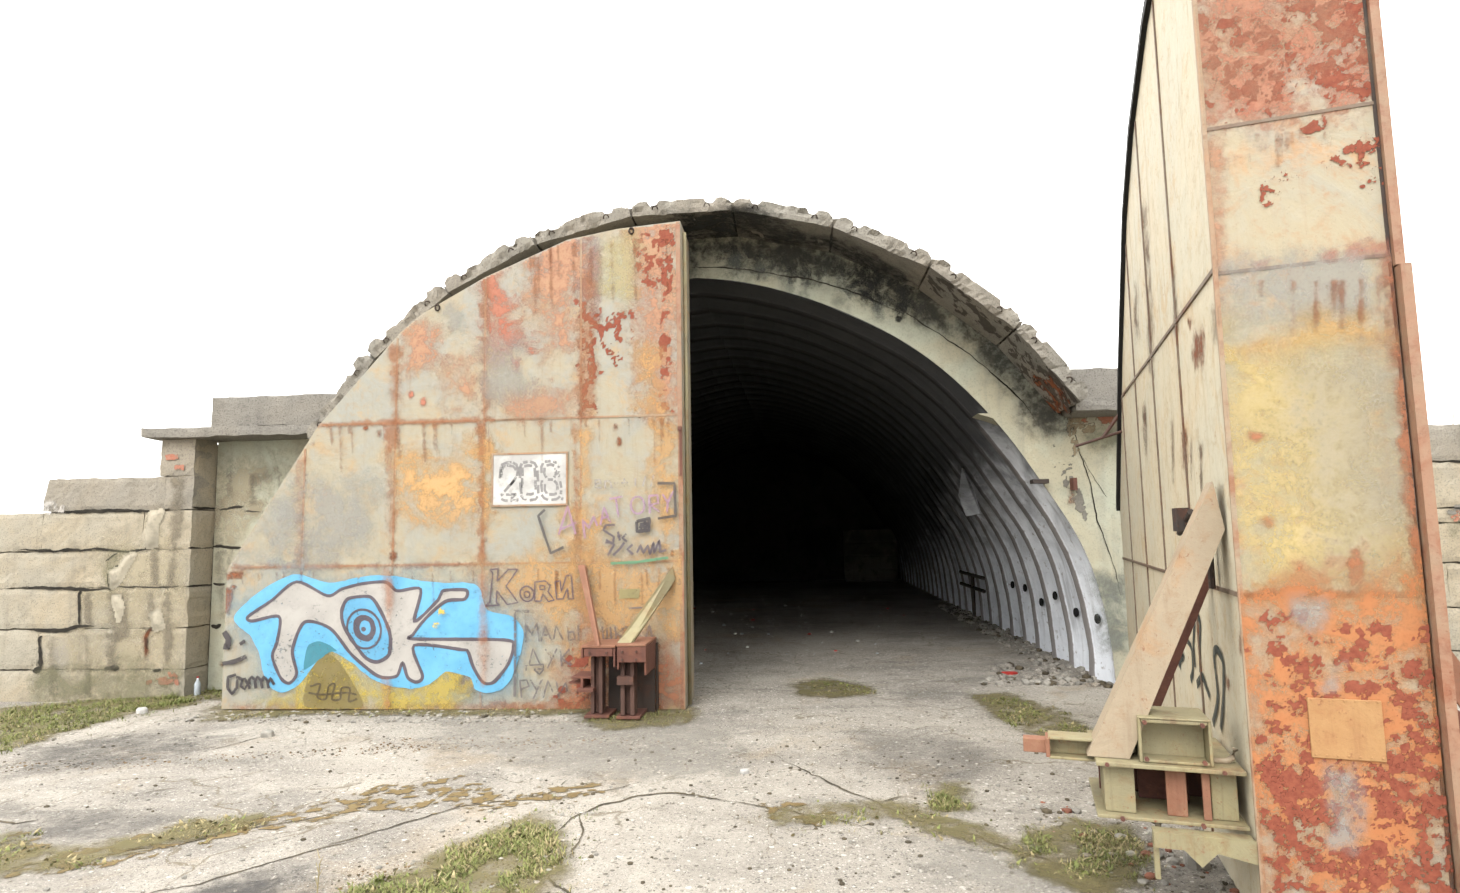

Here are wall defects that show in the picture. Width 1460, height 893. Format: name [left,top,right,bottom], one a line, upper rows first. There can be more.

corrosion [1198,0,1370,140]
corrosion [399,237,602,410]
corrosion [385,436,496,527]
corrosion [485,222,684,709]
corrosion [1226,244,1443,893]